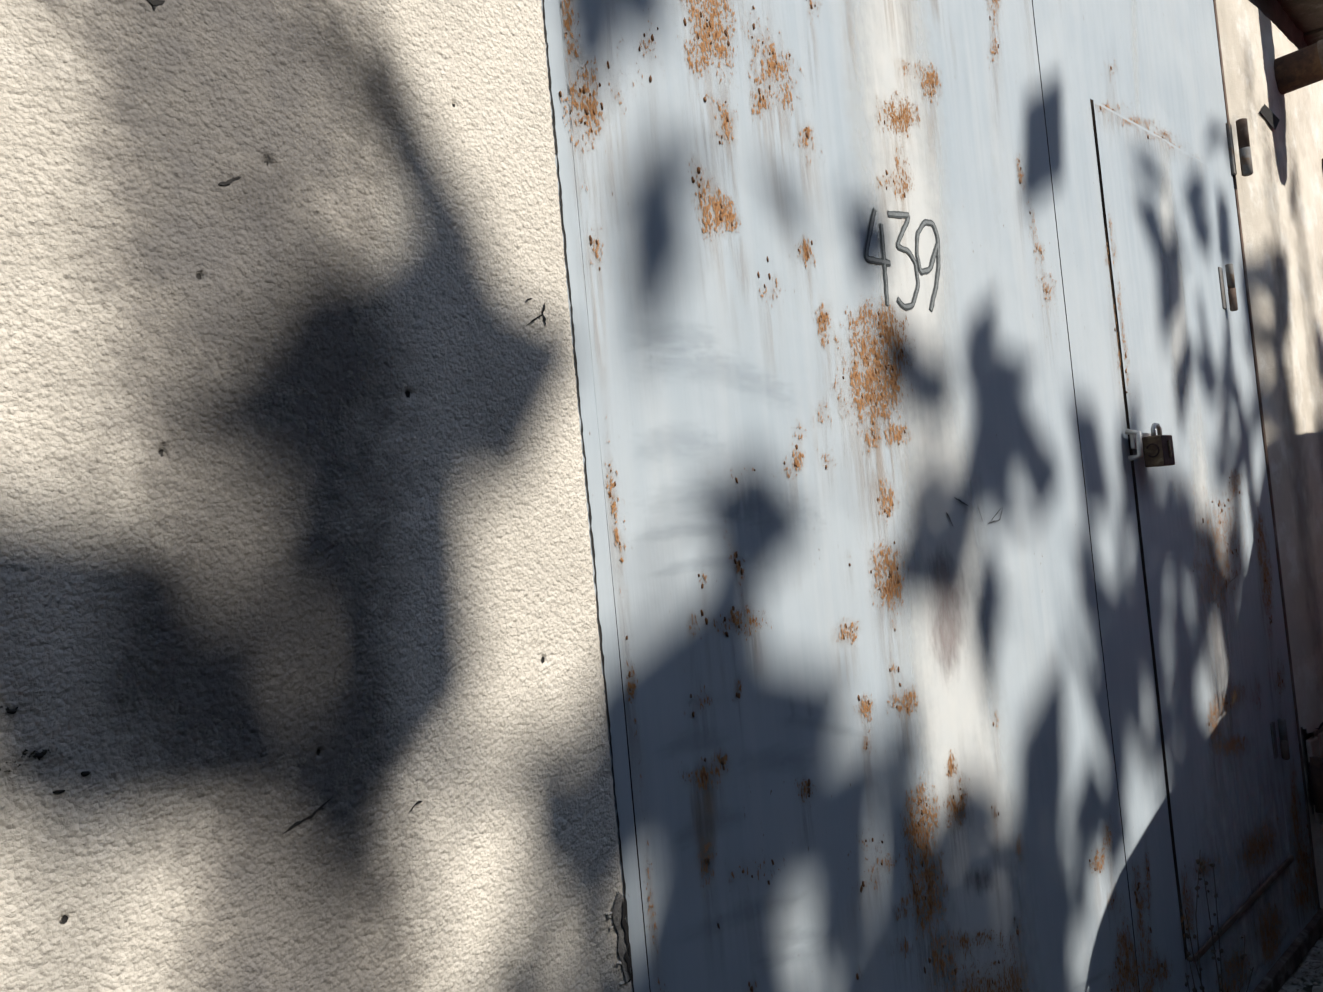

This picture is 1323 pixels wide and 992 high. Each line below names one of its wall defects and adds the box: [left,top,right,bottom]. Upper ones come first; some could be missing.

corrosion [559,0,625,154]
corrosion [633,21,665,85]
corrosion [688,159,741,241]
corrosion [677,0,802,158]
corrosion [872,59,941,200]
corrosion [773,290,927,480]
corrosion [877,478,899,523]
damp [861,0,1026,992]
corrosion [686,521,772,640]
corrosion [868,539,916,631]
corrosion [854,664,918,754]
corrosion [848,749,1035,992]